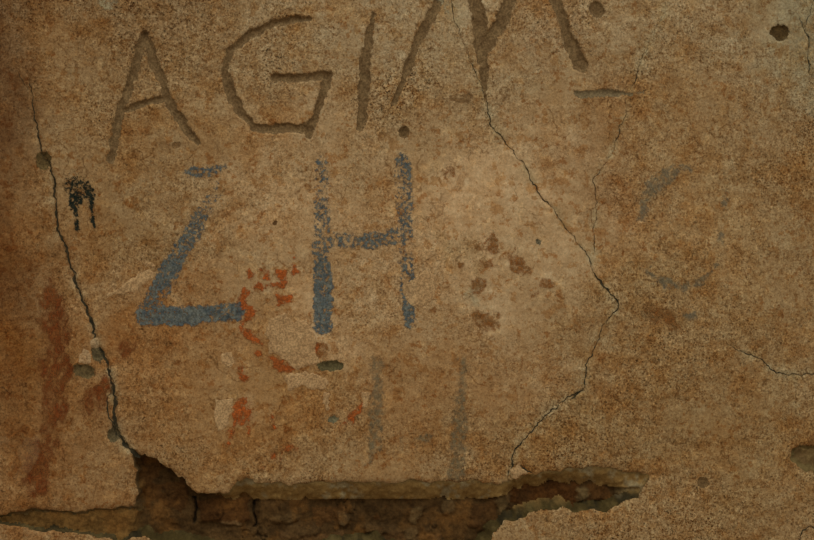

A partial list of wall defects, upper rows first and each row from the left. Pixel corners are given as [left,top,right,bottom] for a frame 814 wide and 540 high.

crack [799,0,814,71]
crack [18,72,140,458]
crack [468,55,619,479]
crack [728,344,814,376]
flaking render [0,454,649,540]
flaking render [790,445,814,473]